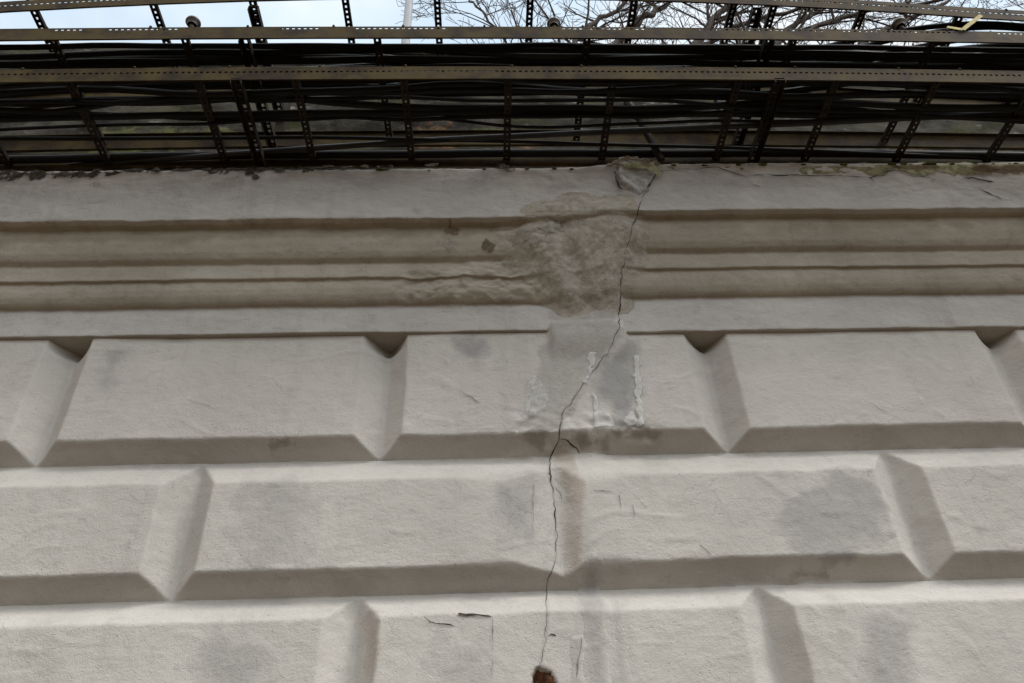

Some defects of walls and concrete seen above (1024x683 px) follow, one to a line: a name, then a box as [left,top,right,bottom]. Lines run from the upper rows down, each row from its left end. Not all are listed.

flaking render [606,155,660,195]
crack [532,191,647,674]